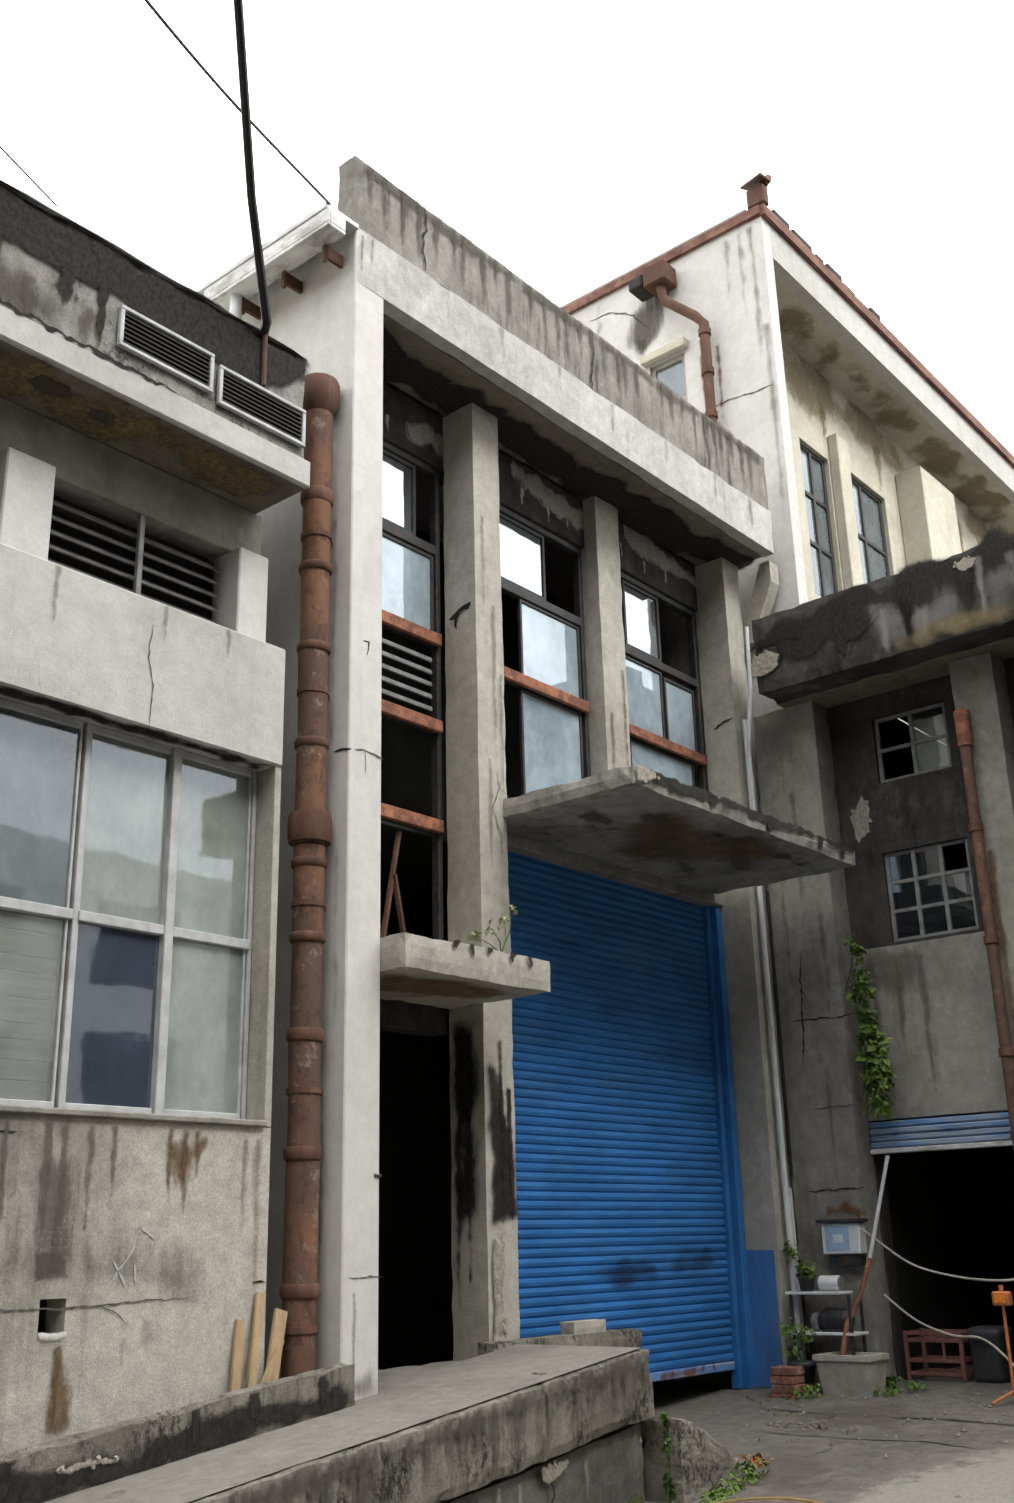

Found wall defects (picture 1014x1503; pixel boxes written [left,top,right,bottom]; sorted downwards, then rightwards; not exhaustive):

damp [0,184,309,387]
damp [364,166,760,477]
damp [779,309,809,338]
crack [716,385,771,406]
damp [383,325,755,571]
spalling [953,555,976,571]
spalling [751,650,779,679]
damp [650,769,854,859]
spalling [850,796,873,843]
corrosion [988,851,1006,955]
damp [38,1122,118,1261]
corrosion [167,1130,207,1198]